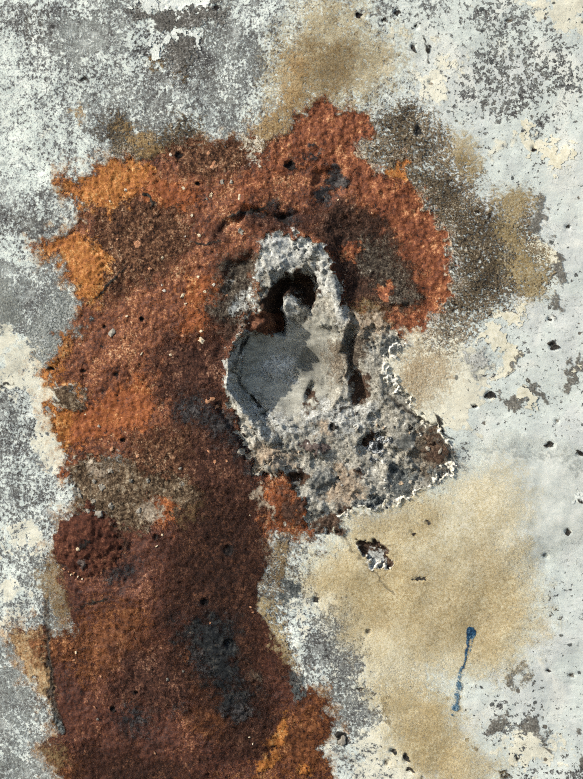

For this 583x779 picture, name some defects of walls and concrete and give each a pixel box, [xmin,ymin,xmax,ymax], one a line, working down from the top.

peeling [125,0,232,76]
damp [245,0,399,146]
rust [6,94,455,779]
spalling [222,227,463,536]
spalling [355,532,394,571]
damp [257,463,544,779]
damp [358,97,558,409]